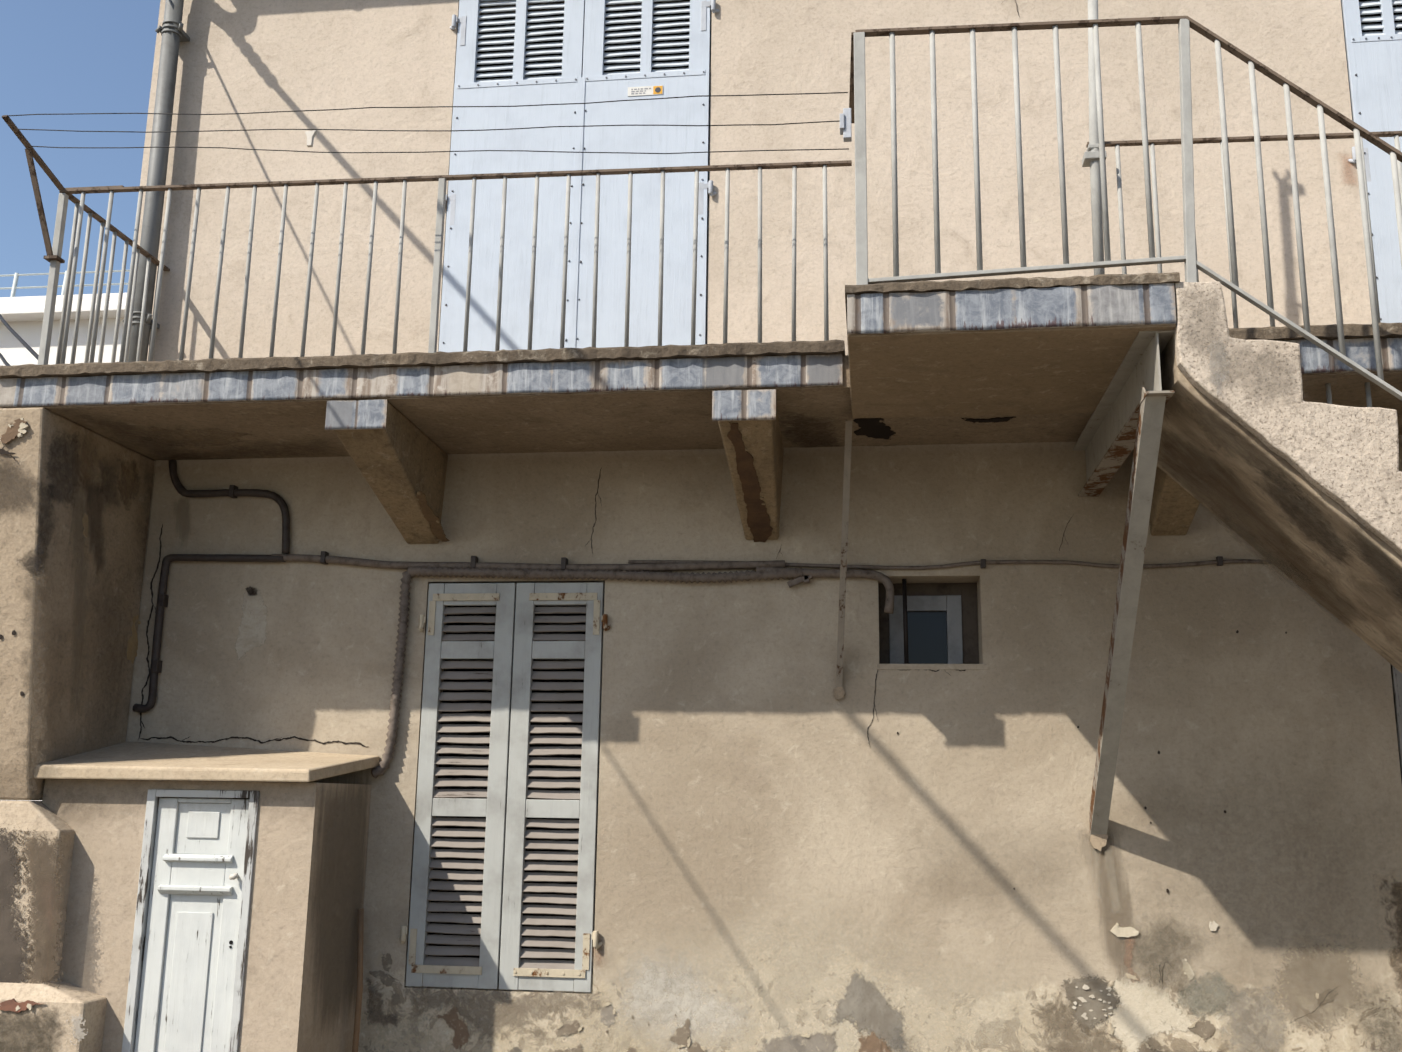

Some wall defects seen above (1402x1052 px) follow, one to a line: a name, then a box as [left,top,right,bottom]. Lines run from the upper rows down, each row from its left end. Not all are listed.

flaking render [0,418,29,444]
leakage [0,439,79,606]
crack [585,467,602,553]
crack [138,524,368,747]
crack [867,670,878,745]
flaking render [369,951,400,1005]
flaking render [437,1007,470,1052]
flaking render [555,1020,583,1052]
flaking render [600,1000,650,1033]
flaking render [670,1014,707,1052]
flaking render [757,1017,891,1052]